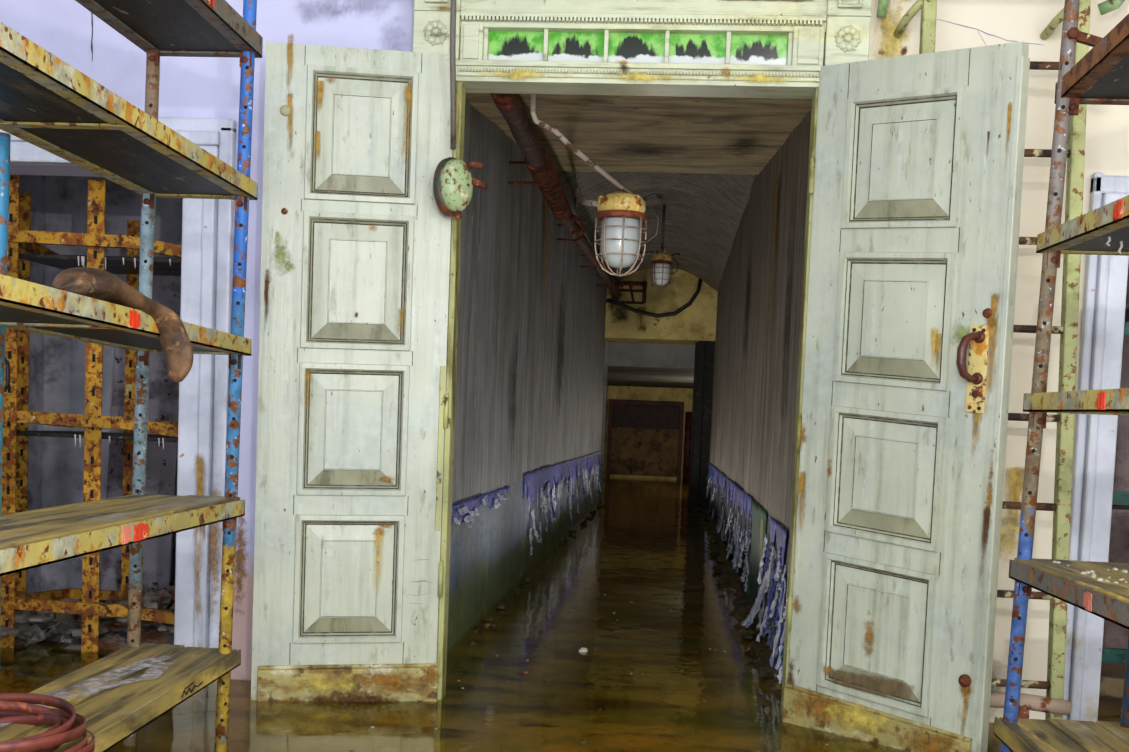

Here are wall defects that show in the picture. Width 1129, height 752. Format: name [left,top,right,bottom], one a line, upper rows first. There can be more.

damp [882,13,906,58]
peeling [451,451,602,555]
peeling [705,462,800,685]